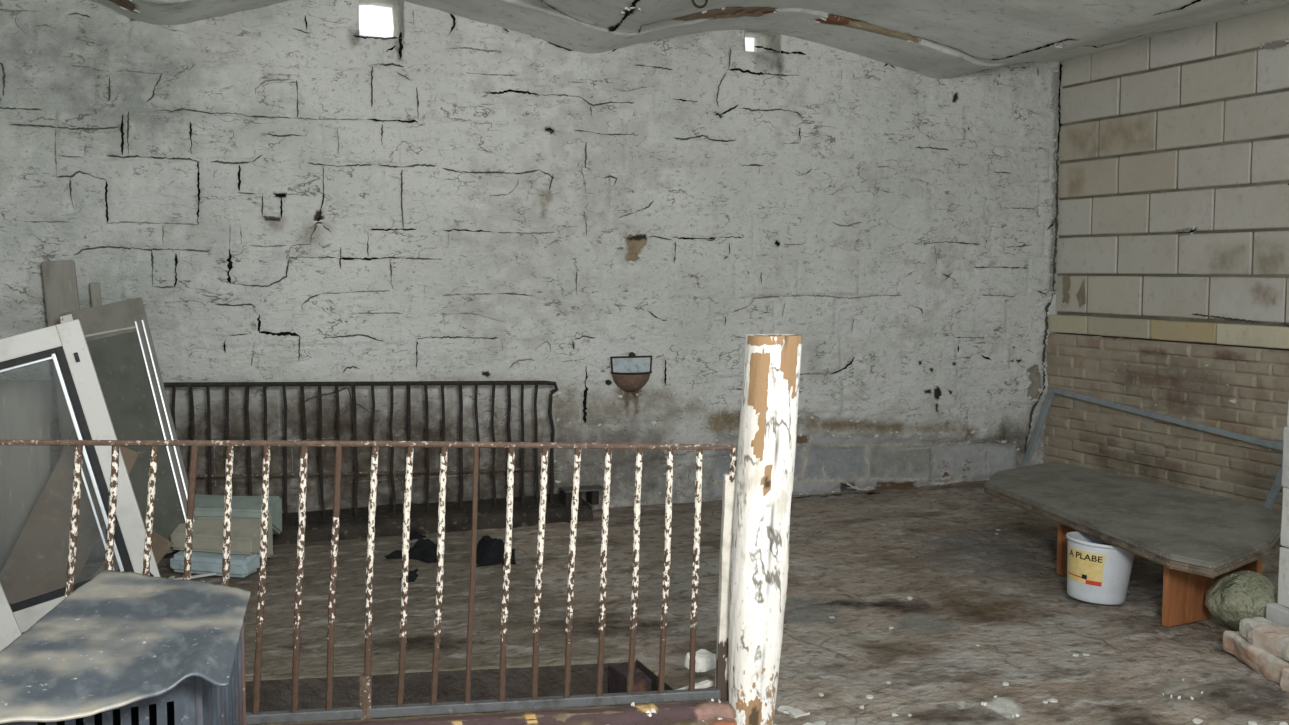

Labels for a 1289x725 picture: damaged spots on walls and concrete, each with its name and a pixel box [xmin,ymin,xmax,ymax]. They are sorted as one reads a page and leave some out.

spalling [673,7,781,21]
spalling [812,14,924,43]
crack [879,147,948,169]
crack [0,0,923,423]
crack [908,0,1201,453]
spalling [626,234,647,264]